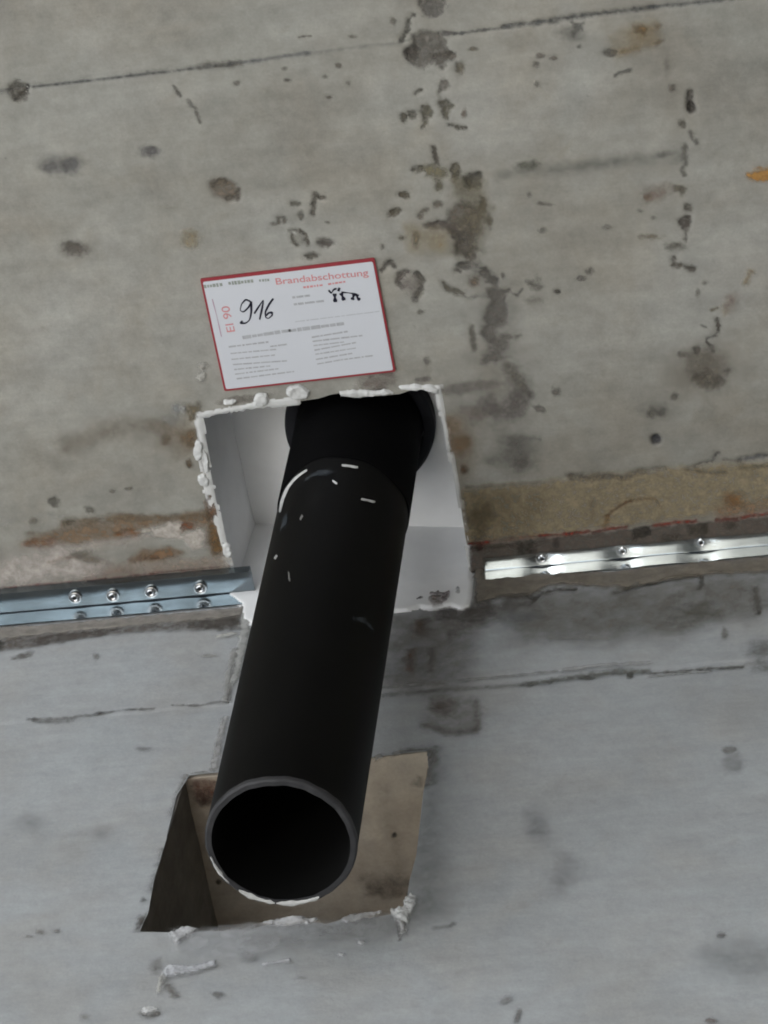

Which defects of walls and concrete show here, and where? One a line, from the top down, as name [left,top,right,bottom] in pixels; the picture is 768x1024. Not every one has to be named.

crack [454,0,722,35]
crack [20,56,283,88]
rust [746,169,768,181]
leakage [363,372,393,391]
rust [163,404,199,447]
rust [24,495,223,564]
rust [88,547,180,577]
crack [383,661,744,693]
crack [29,708,154,722]